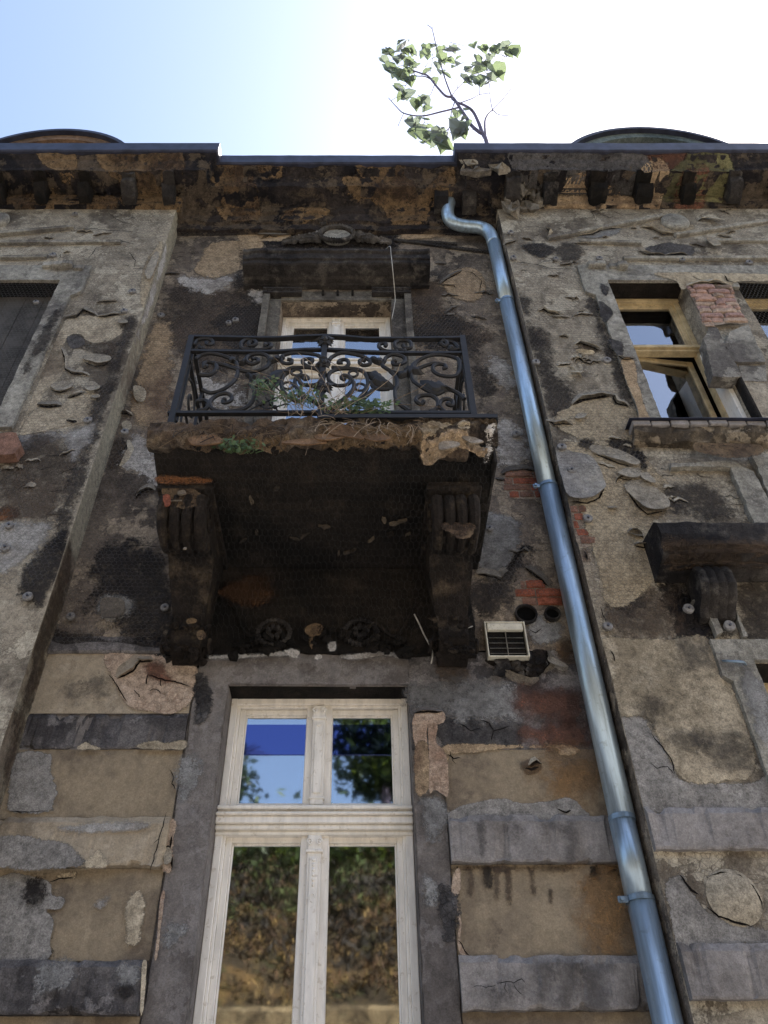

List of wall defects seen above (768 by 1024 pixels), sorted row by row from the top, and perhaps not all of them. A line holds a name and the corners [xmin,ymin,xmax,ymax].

flaking render [6,153,186,224]
peeling [18,165,330,470]
flaking render [654,272,768,327]
flaking render [495,464,541,500]
peeling [546,355,688,608]
peeling [103,653,198,715]
peeling [403,565,581,797]
crack [150,812,167,869]
leakage [452,821,575,904]
crack [474,978,526,994]